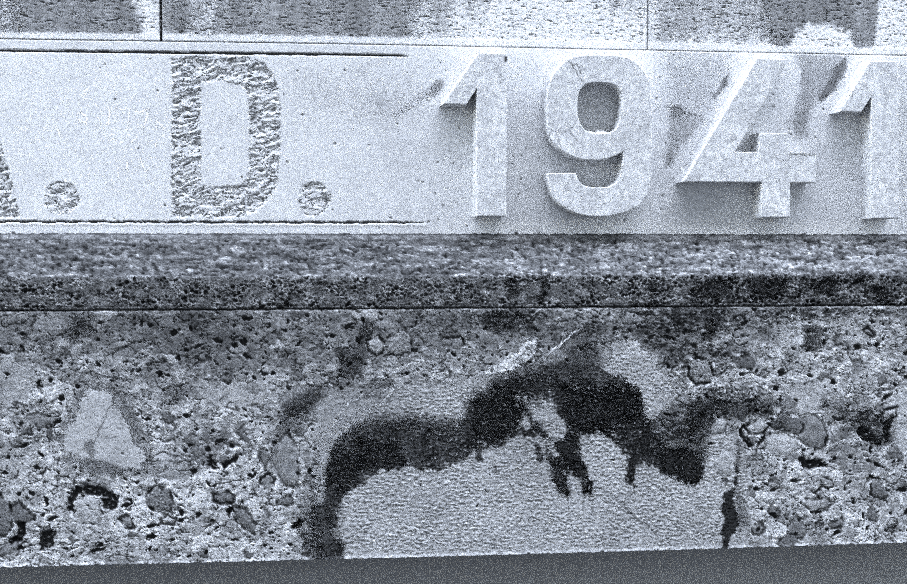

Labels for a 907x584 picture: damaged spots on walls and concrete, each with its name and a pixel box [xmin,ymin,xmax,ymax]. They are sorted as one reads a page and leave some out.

leakage [303,328,714,560]
leakage [715,437,748,549]